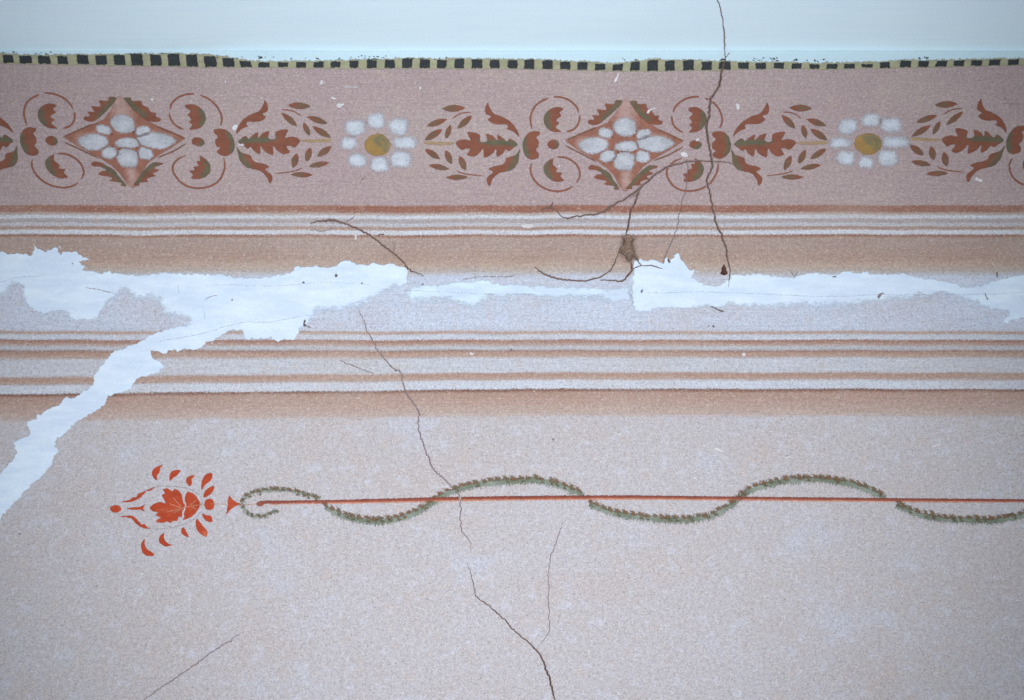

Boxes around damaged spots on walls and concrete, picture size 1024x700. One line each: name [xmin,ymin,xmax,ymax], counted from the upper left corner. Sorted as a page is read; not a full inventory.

crack [310,0,821,297]
crack [340,315,563,700]